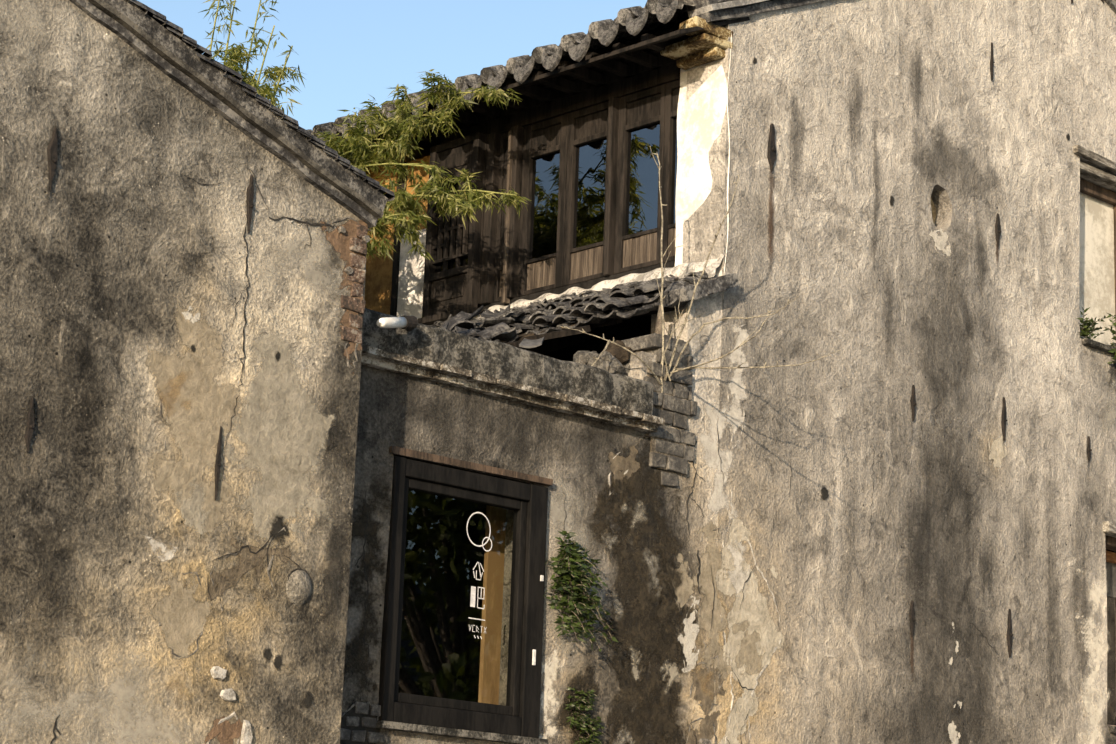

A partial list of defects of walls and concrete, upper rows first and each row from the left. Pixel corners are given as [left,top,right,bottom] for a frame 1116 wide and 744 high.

crack [188,160,347,454]
flaking render [263,216,371,374]
peeling [929,228,951,256]
peeling [146,306,336,660]
peeling [608,324,785,744]
water stain [0,656,181,744]
flaking render [198,666,253,744]
spalling [263,648,282,670]
peeling [948,701,962,744]
water stain [1076,580,1116,744]